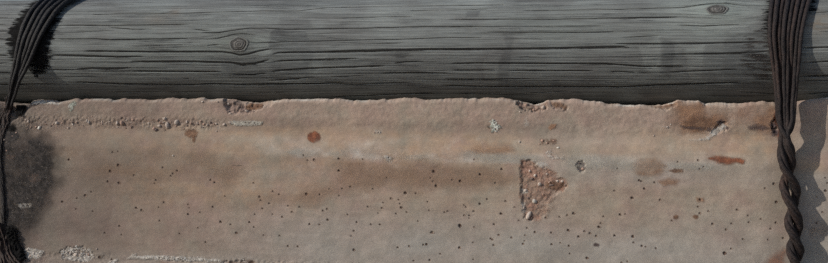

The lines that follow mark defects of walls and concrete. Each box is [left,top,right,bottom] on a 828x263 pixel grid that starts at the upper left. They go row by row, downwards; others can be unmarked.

rust [307,131,320,143]
rust [709,156,744,164]
spalling [519,160,567,220]